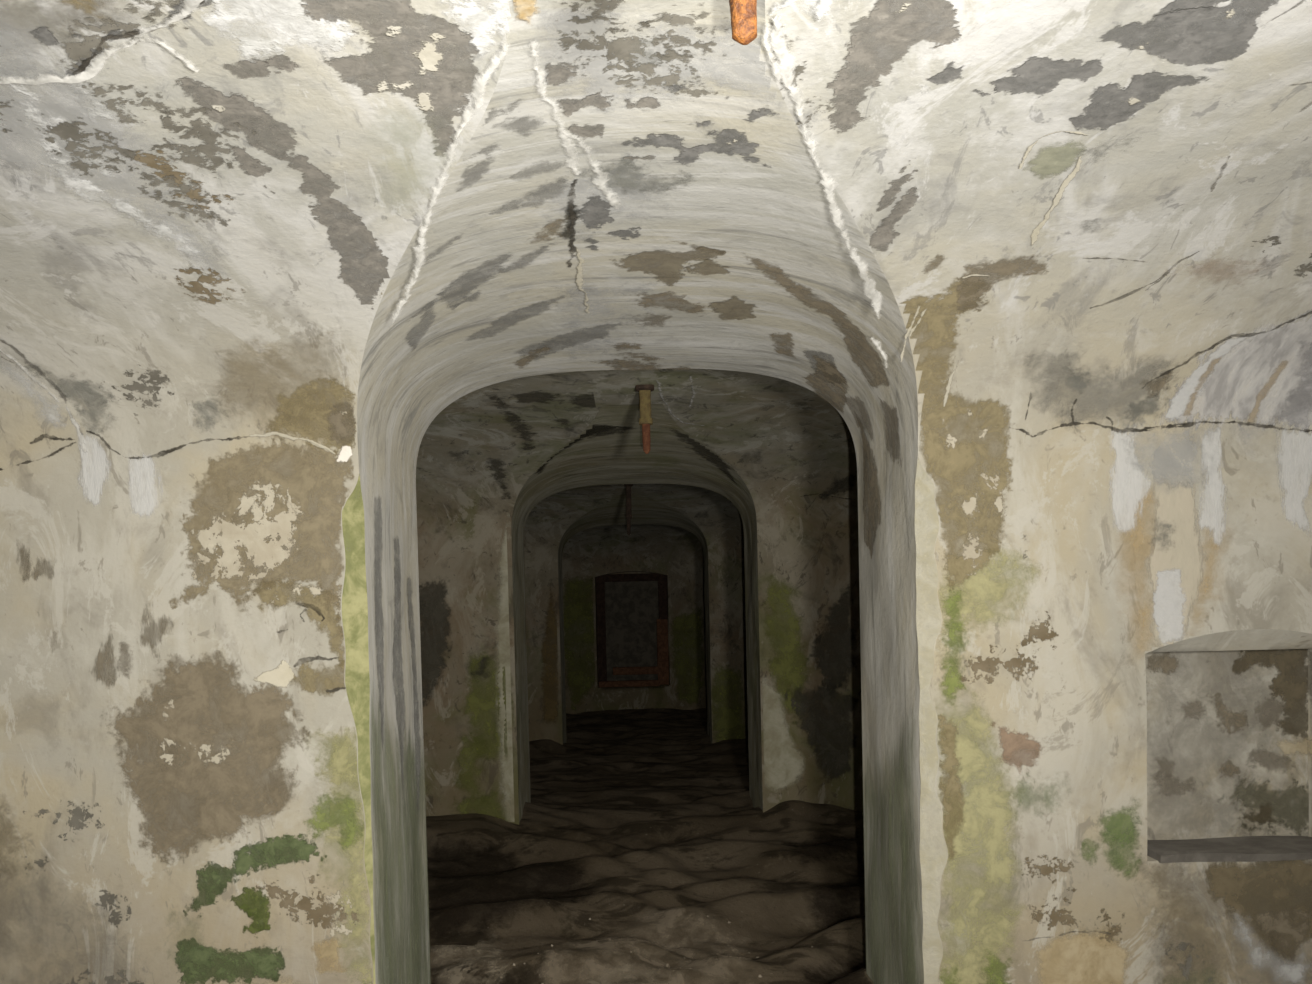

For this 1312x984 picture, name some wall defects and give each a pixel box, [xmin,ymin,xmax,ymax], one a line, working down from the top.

crack [0,0,205,85]
damp [486,102,540,135]
damp [458,146,496,191]
crack [532,42,620,313]
crack [1142,311,1312,389]
crack [0,340,335,470]
damp [901,256,1046,586]
crack [1009,399,1312,437]
damp [1046,313,1312,673]
peeling [255,581,345,663]
peeling [254,660,294,687]
damp [762,587,858,789]